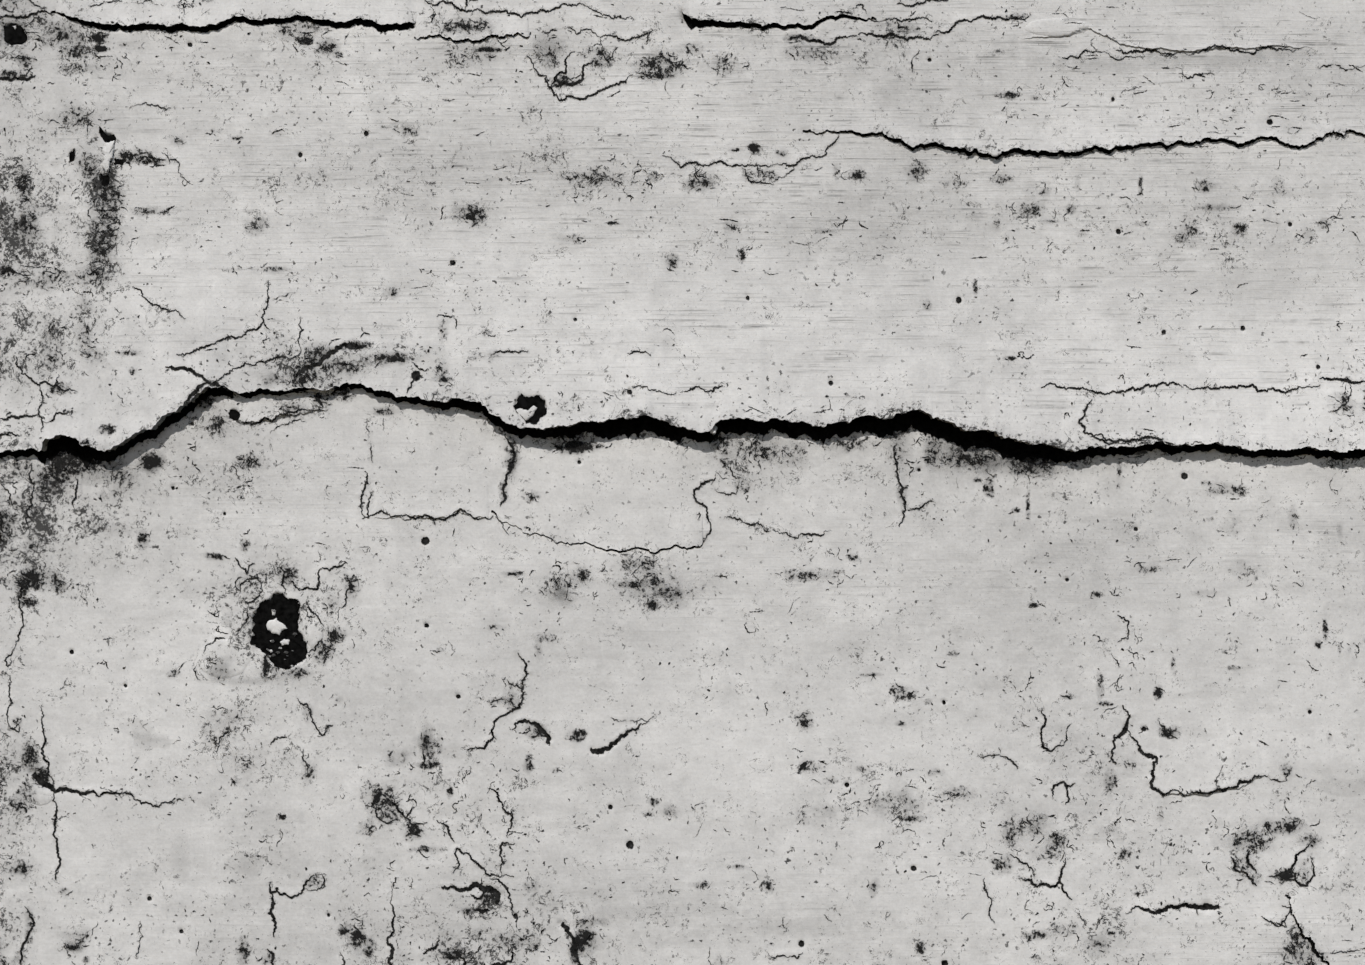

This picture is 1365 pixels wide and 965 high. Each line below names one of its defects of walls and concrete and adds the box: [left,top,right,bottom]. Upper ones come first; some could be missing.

peeling [54,0,530,41]
peeling [682,0,873,26]
peeling [1021,0,1315,51]
peeling [808,74,1365,157]
peeling [101,140,115,174]
peeling [0,220,1365,452]
peeling [266,610,290,646]
crack [0,265,1365,965]
peeling [1290,831,1365,965]